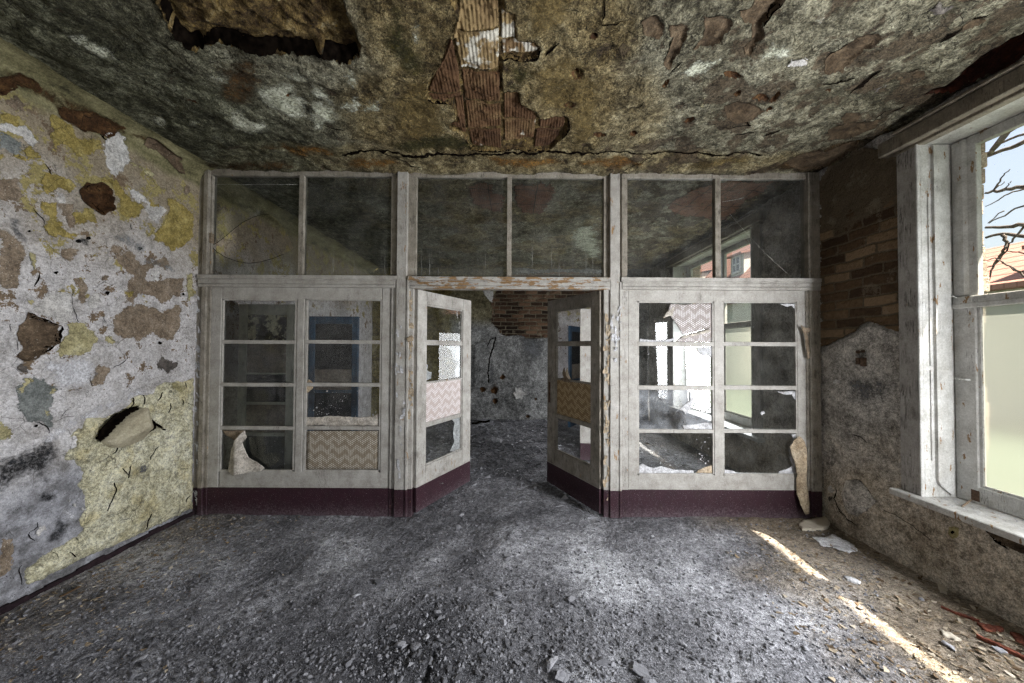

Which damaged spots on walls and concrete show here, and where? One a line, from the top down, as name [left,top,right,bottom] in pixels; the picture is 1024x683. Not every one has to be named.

spalling [0,73,42,96]
spalling [155,0,362,65]
spalling [425,0,576,153]
peeling [724,71,781,124]
peeling [824,34,882,75]
peeling [0,107,126,162]
crack [324,122,780,170]
flaking render [784,140,899,359]
peeling [15,172,200,428]
flaking render [483,290,595,339]
crack [487,337,496,383]